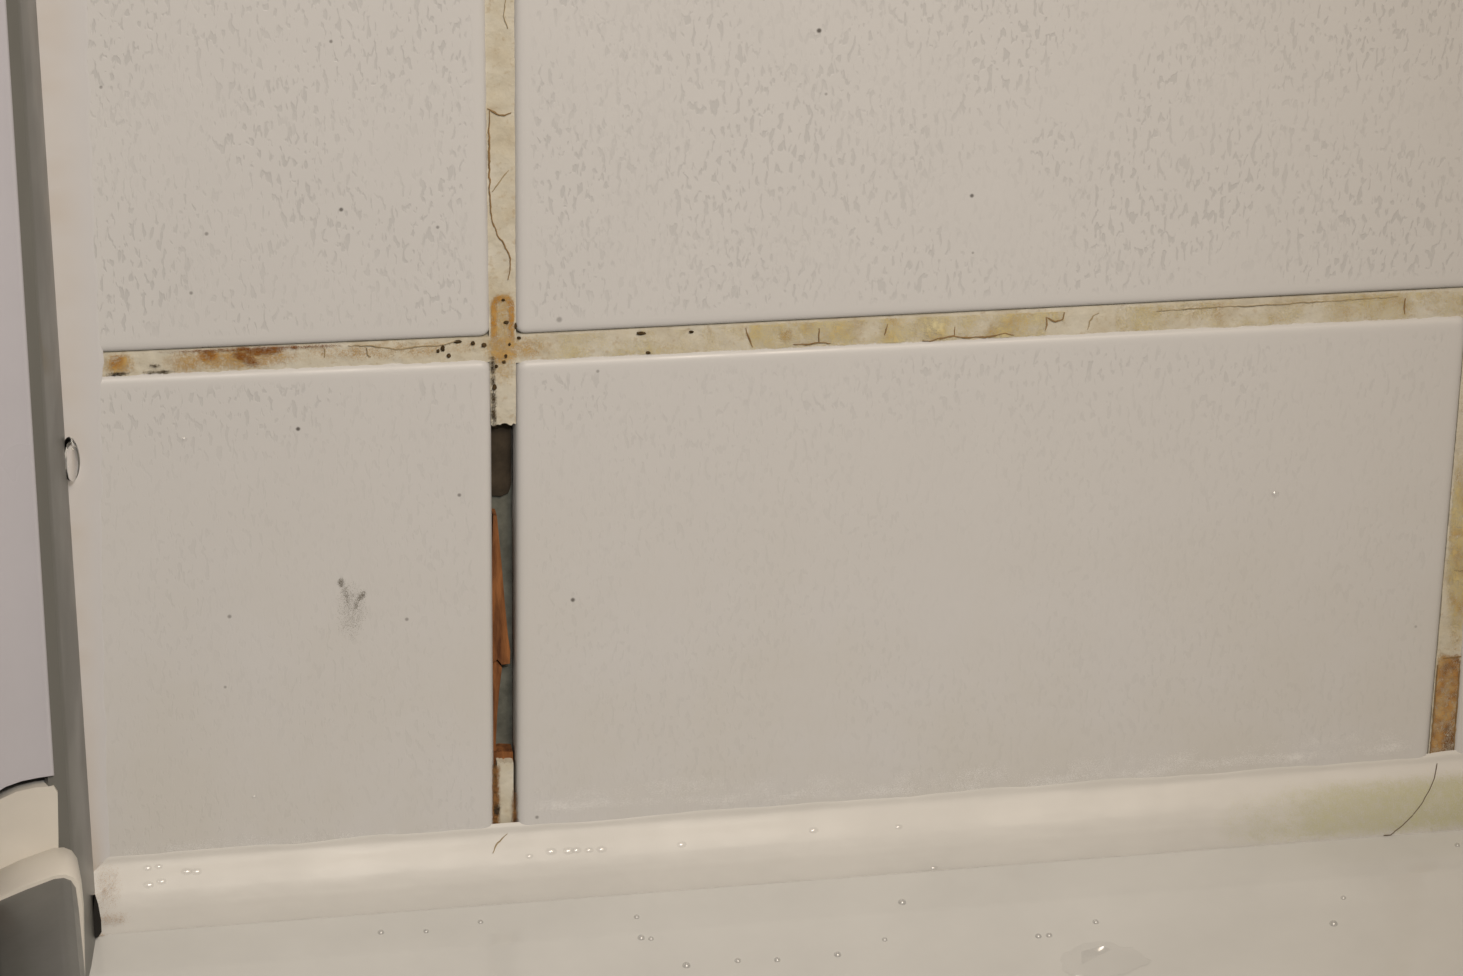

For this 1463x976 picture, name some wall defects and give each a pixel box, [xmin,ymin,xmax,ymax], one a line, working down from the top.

crack [487,108,511,280]
rust [105,294,552,384]
water stain [436,321,521,427]
water stain [540,311,1065,358]
crack [922,312,1099,342]
crack [1156,296,1406,314]
water stain [1116,290,1463,331]
water stain [1215,452,1463,845]
water stain [492,729,1412,824]